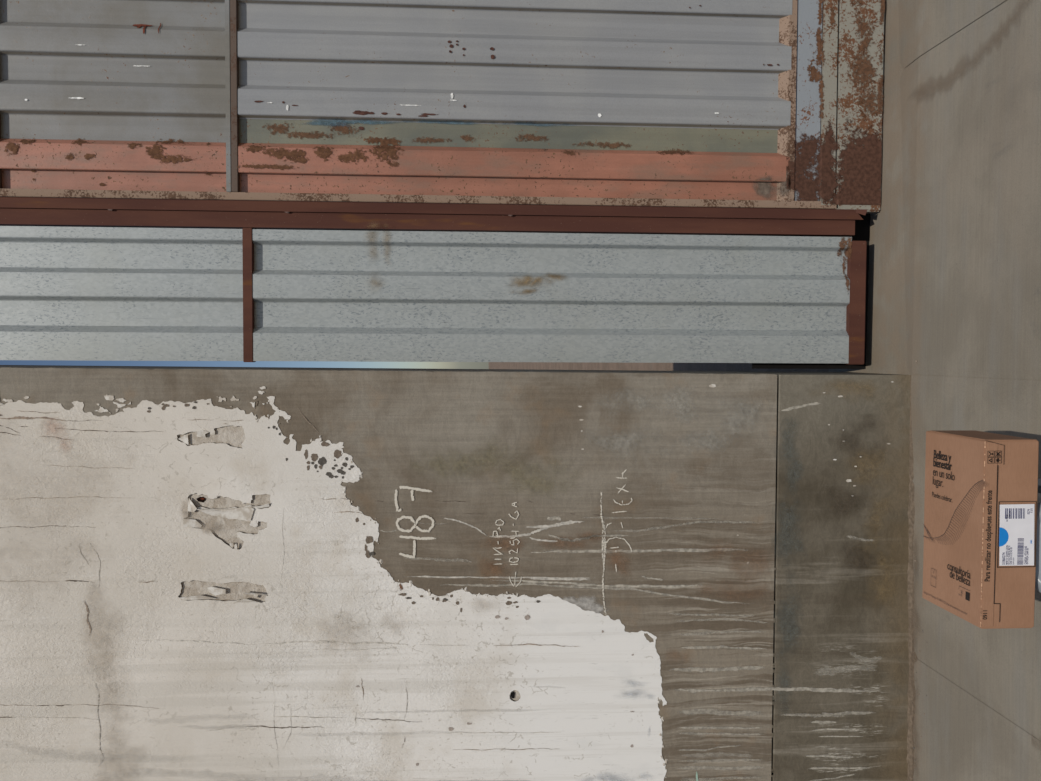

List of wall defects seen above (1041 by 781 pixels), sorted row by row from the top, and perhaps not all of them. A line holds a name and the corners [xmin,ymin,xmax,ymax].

corrosion [783,0,885,205]
corrosion [237,118,476,170]
corrosion [563,142,630,155]
peeling [147,386,289,435]
spalling [178,425,245,448]
spalling [183,493,271,550]
peeling [304,435,488,612]
spalling [178,580,268,603]
damp [786,711,874,737]
damp [806,755,869,781]